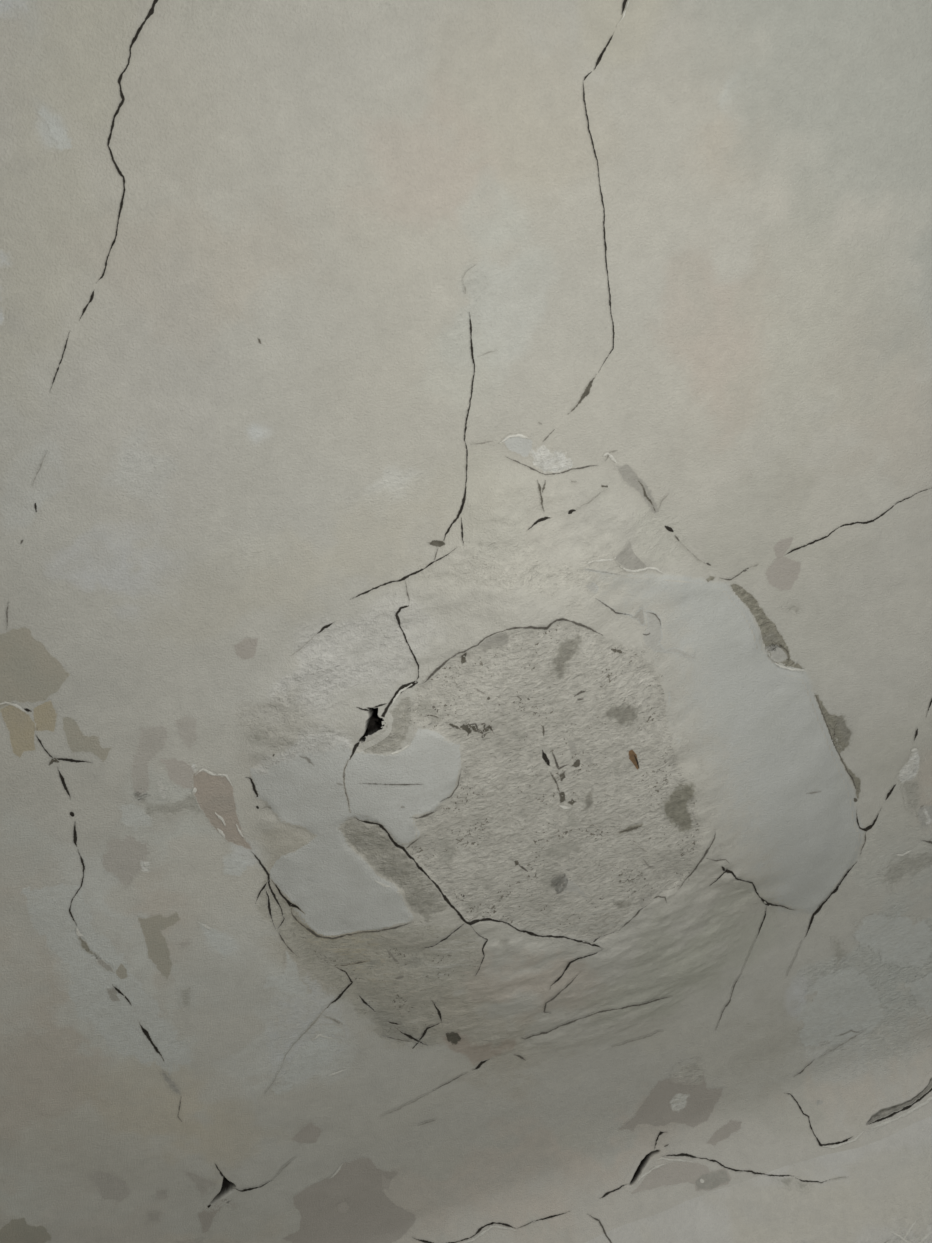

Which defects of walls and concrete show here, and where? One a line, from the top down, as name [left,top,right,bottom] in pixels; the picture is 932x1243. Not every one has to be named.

crack [49,0,159,394]
crack [538,0,630,442]
crack [291,264,609,717]
spalling [471,433,670,515]
crack [664,487,932,581]
crack [35,734,183,1122]
peeling [101,758,253,889]
peeling [282,1157,416,1243]
crack [412,1183,629,1243]
spalling [249,537,869,1089]
crack [250,741,897,1127]
crack [653,1029,867,1184]